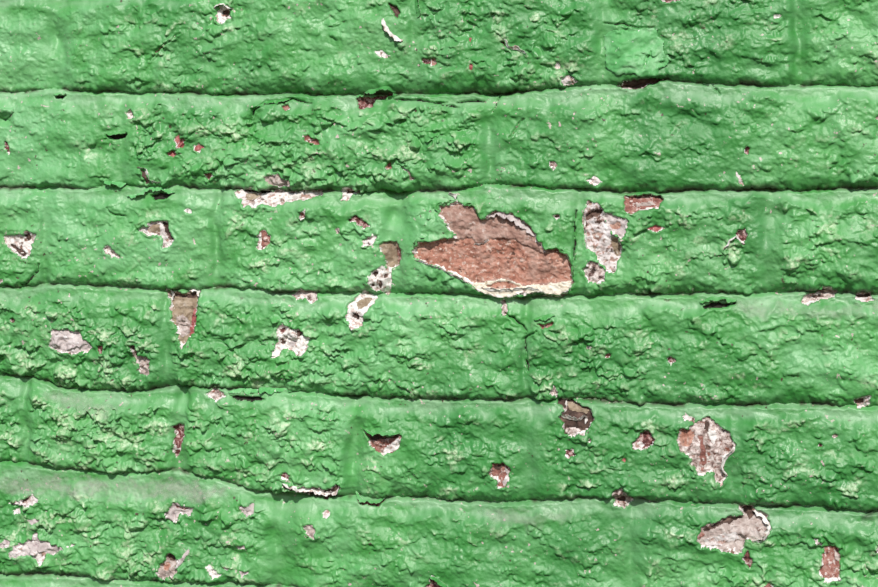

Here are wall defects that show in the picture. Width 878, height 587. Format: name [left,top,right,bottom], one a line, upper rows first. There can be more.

peeling [235,173,323,220]
peeling [4,231,36,259]
peeling [345,215,401,330]
peeling [412,192,664,316]
peeling [49,329,103,354]
peeling [166,288,201,349]
peeling [271,324,310,358]
peeling [549,386,594,443]
peeling [677,413,736,487]
peeling [0,494,75,566]
peeling [696,505,772,567]
peeling [814,538,841,583]